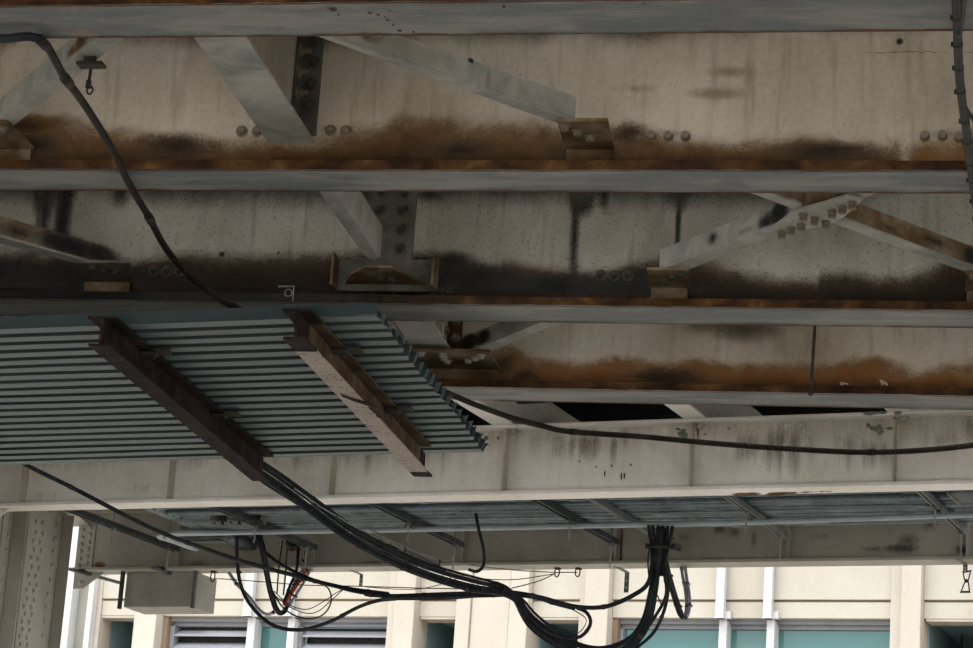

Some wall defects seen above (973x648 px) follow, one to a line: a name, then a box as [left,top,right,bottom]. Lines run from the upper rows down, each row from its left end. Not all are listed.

corrosion [0,0,687,8]
corrosion [45,35,293,57]
corrosion [308,29,973,47]
corrosion [14,114,567,160]
corrosion [611,125,973,161]
corrosion [116,253,678,308]
corrosion [687,263,973,312]
corrosion [455,321,973,405]